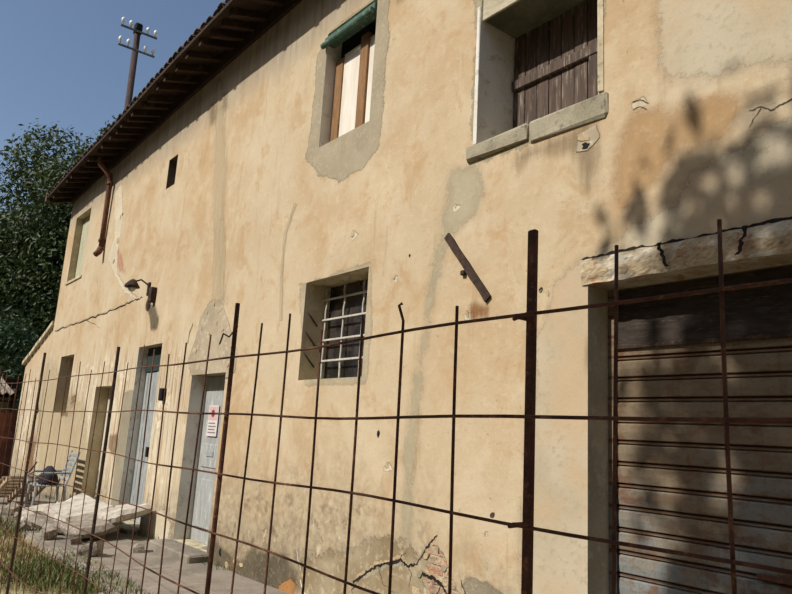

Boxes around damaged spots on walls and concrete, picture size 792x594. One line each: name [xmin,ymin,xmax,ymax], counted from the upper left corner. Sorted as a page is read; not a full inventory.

peeling [651,0,792,78]
crack [55,297,142,331]
crack [279,204,296,320]
peeling [425,165,483,318]
flaking render [576,125,600,152]
peeling [614,95,738,208]
crack [581,216,792,267]
peeling [592,117,792,261]
crack [749,98,792,127]
peeling [278,330,460,594]
peeling [533,260,588,594]
crack [351,535,465,594]